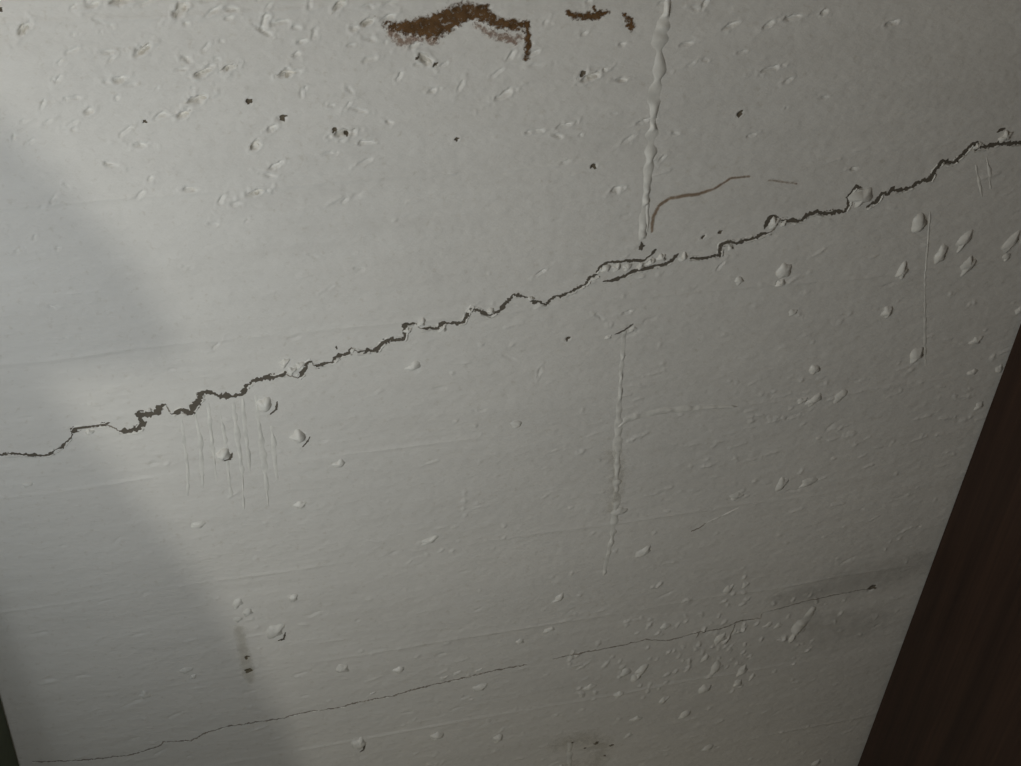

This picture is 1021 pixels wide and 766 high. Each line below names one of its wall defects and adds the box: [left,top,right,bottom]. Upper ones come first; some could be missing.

corrosion [383,2,531,61]
corrosion [565,5,610,21]
corrosion [622,13,635,31]
crack [0,128,1021,458]
crack [553,587,870,660]
crack [32,664,525,763]